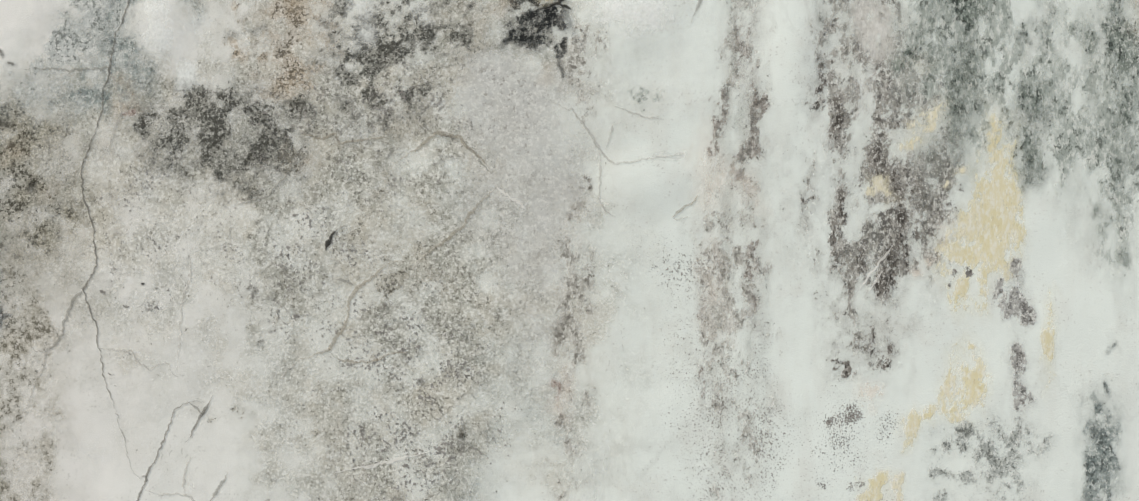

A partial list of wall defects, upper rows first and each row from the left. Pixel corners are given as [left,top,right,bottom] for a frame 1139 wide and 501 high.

crack [80,0,212,501]
leakage [0,0,530,501]
crack [325,231,336,251]
leakage [503,0,607,124]
leakage [553,240,596,453]
leakage [650,0,1139,501]